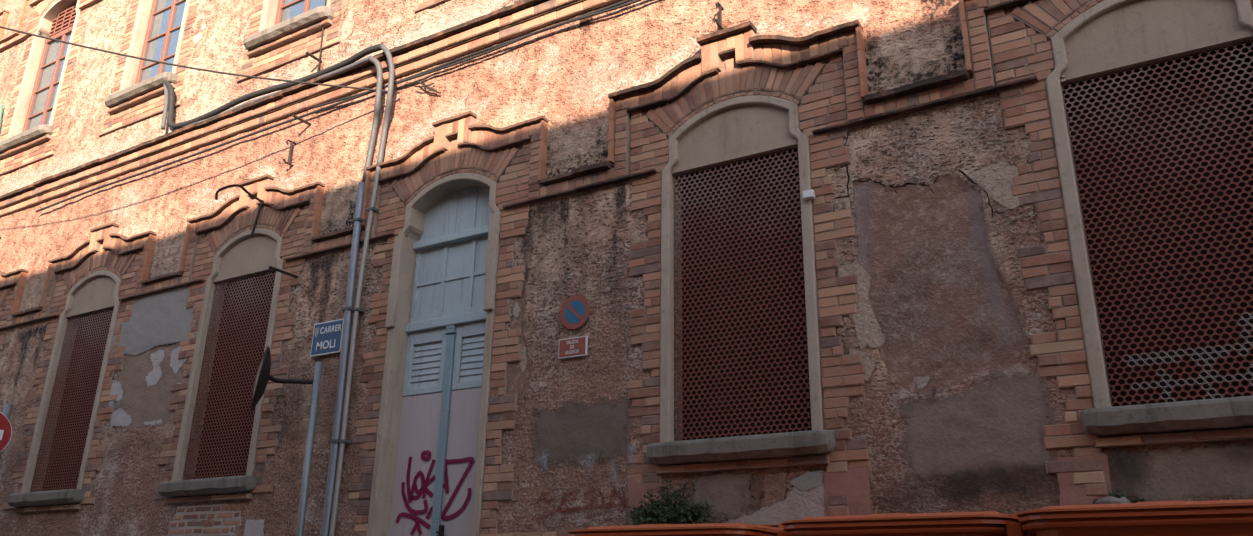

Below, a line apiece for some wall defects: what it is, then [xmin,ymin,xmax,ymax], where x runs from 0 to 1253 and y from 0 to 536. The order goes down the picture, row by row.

water stain [865,27,964,104]
flaking render [853,174,1030,398]
peeling [109,343,188,429]